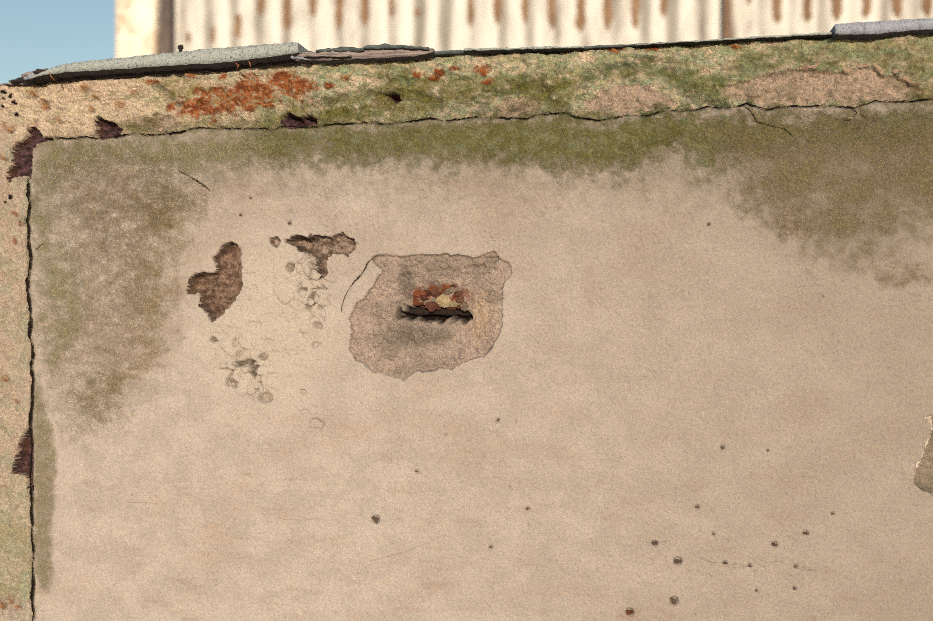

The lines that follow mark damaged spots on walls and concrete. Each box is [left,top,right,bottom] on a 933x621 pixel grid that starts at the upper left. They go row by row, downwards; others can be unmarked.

corrosion [166,71,349,124]
corrosion [413,66,460,81]
crack [51,98,933,140]
water stain [736,124,933,247]
flaking render [186,232,356,410]
crack [341,255,378,312]
spalling [348,250,512,381]
crack [25,178,45,621]
spalling [914,415,933,495]